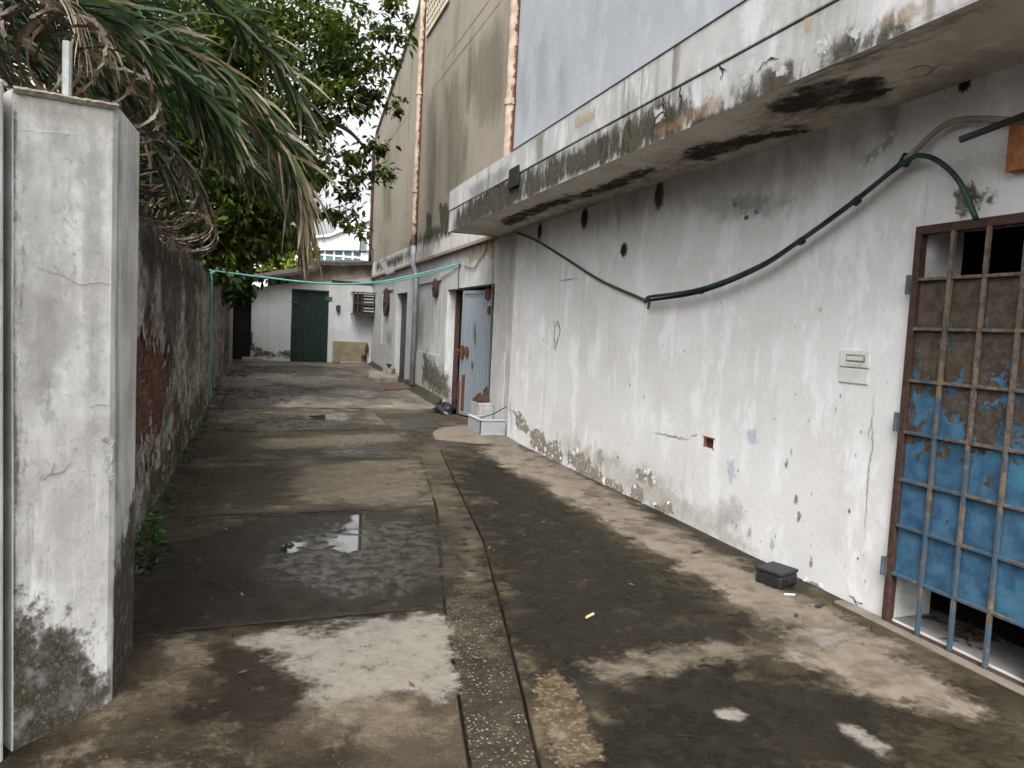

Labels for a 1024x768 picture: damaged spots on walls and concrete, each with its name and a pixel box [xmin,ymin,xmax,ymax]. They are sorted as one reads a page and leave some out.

peeling [772,60,788,78]
peeling [846,26,861,42]
leakage [377,60,794,271]
leakage [953,181,993,219]
flaking render [135,301,181,493]
spalling [513,410,679,515]
crack [865,395,875,538]